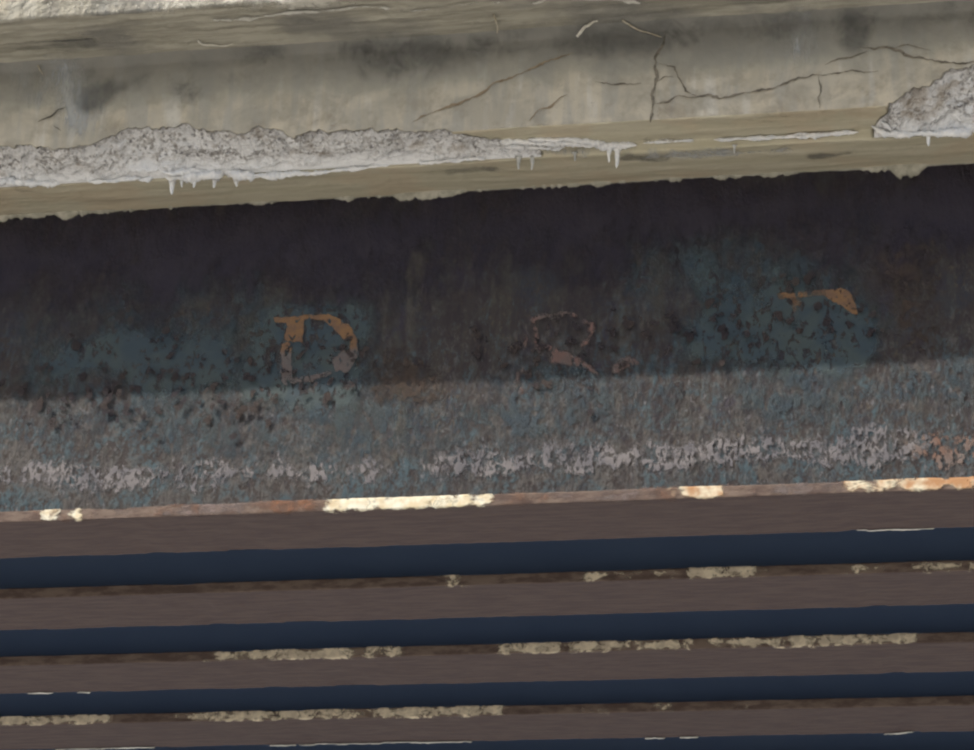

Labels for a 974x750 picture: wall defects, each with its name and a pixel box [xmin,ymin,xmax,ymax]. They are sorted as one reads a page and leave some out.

crack [415,53,571,121]
crack [599,34,974,123]
water stain [871,121,974,139]
water stain [418,157,487,165]
water stain [0,177,60,188]
water stain [88,164,389,185]
rust [145,333,378,425]
peeling [420,422,974,491]
peeling [672,485,723,499]
peeling [40,508,82,521]
rust [257,500,314,513]
peeling [323,494,493,513]